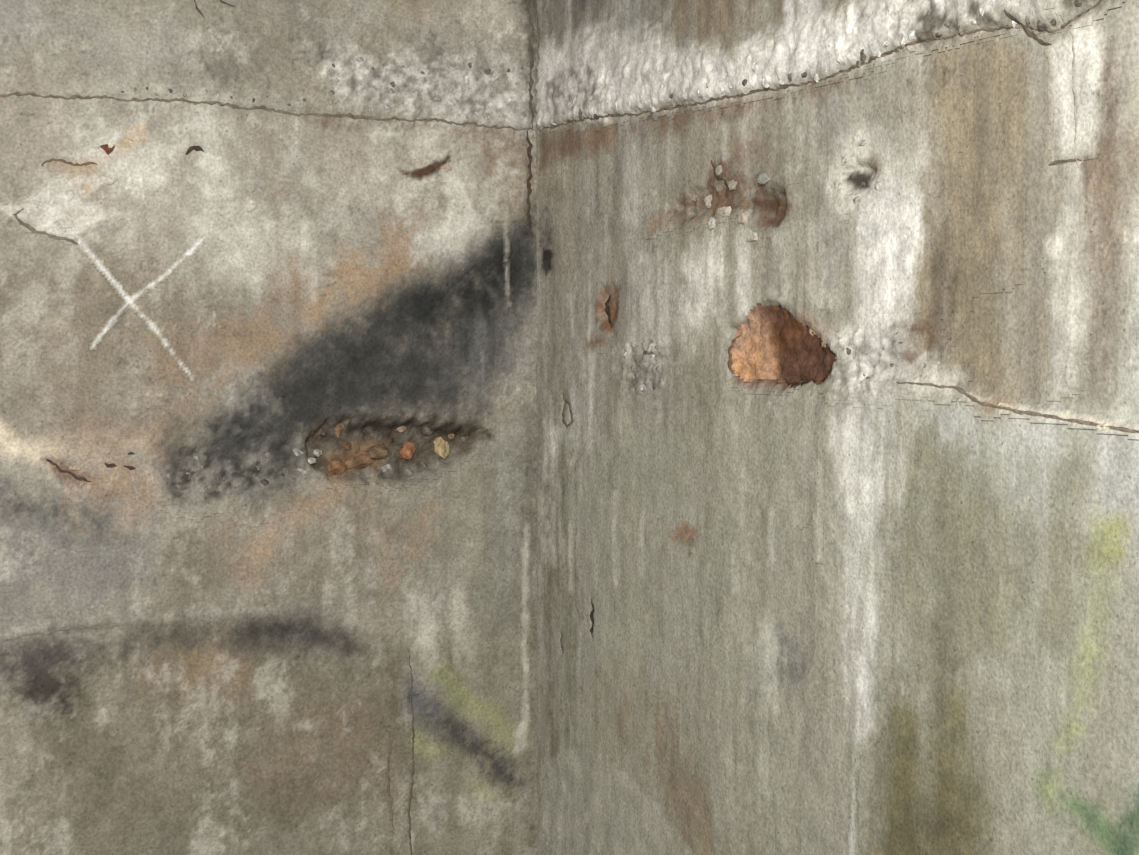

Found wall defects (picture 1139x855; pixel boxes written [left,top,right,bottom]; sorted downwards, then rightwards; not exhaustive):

damp [42,33,537,325]
crack [0,0,1101,230]
spalling [641,121,798,242]
spalling [154,407,498,517]
damp [400,267,598,761]
rust [580,281,623,358]
damp [535,0,1139,855]
damp [390,763,417,855]